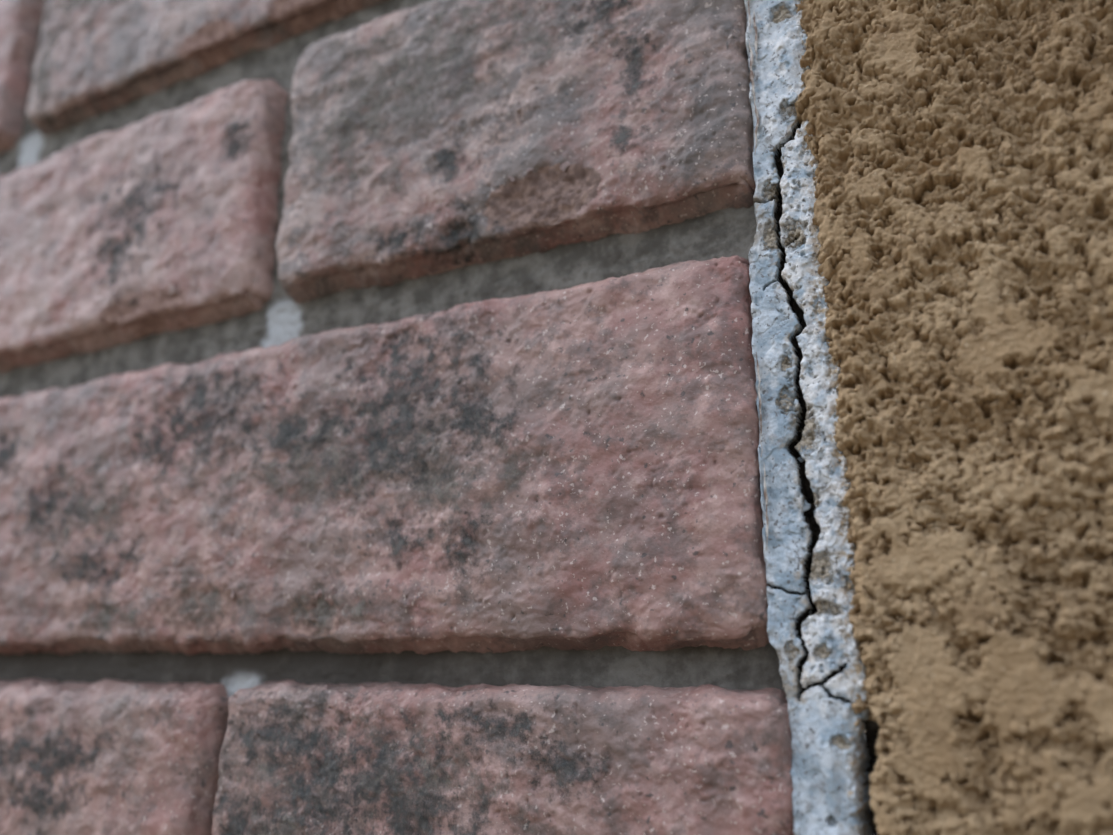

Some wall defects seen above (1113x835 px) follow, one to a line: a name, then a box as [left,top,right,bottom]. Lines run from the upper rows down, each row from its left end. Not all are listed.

crack [754,122,880,835]